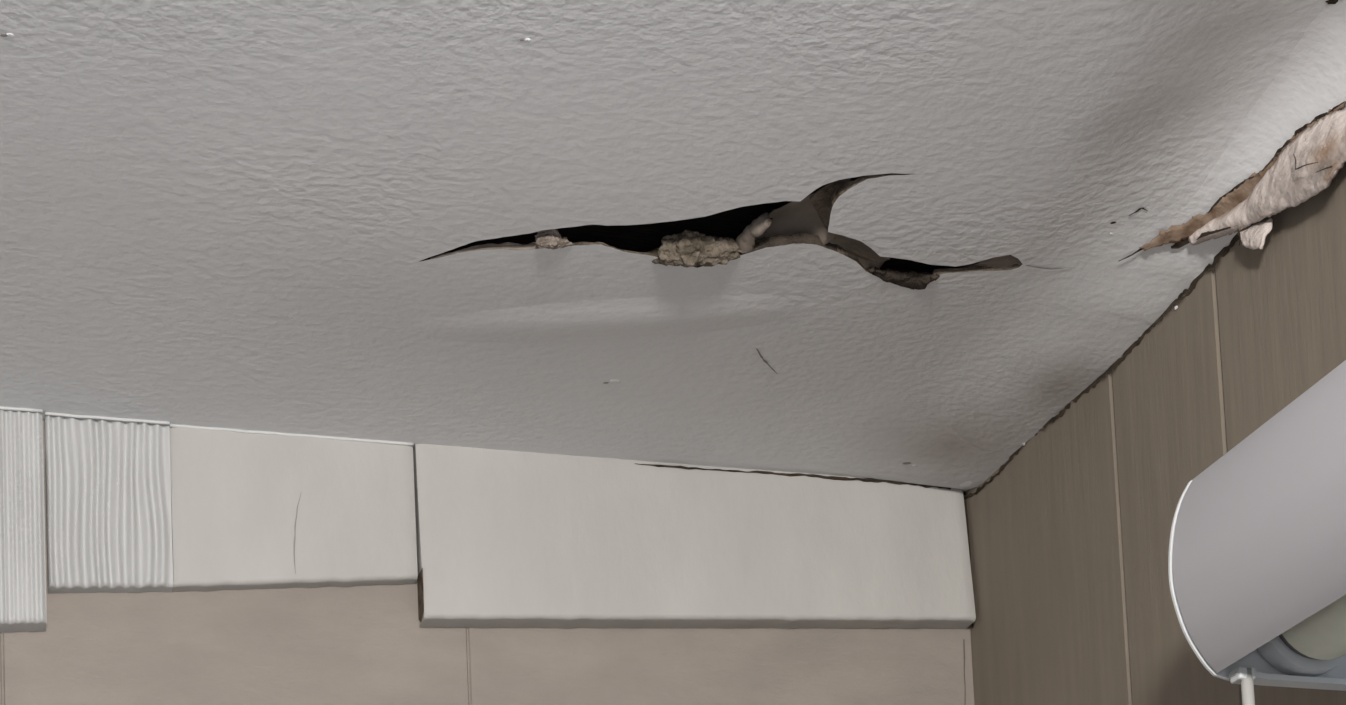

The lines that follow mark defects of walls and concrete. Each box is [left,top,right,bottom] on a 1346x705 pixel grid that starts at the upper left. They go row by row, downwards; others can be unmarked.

crack [419,173,1071,290]
peeling [1119,101,1346,261]